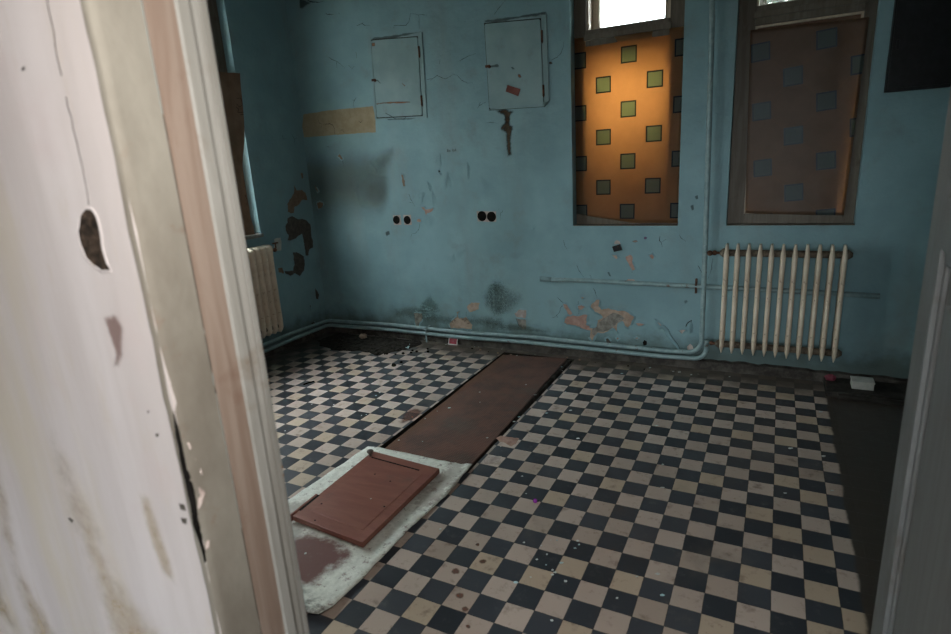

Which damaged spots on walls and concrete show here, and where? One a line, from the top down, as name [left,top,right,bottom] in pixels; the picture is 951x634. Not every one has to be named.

rust [498,110,513,155]
peeling [278,173,320,278]
peeling [562,297,636,343]